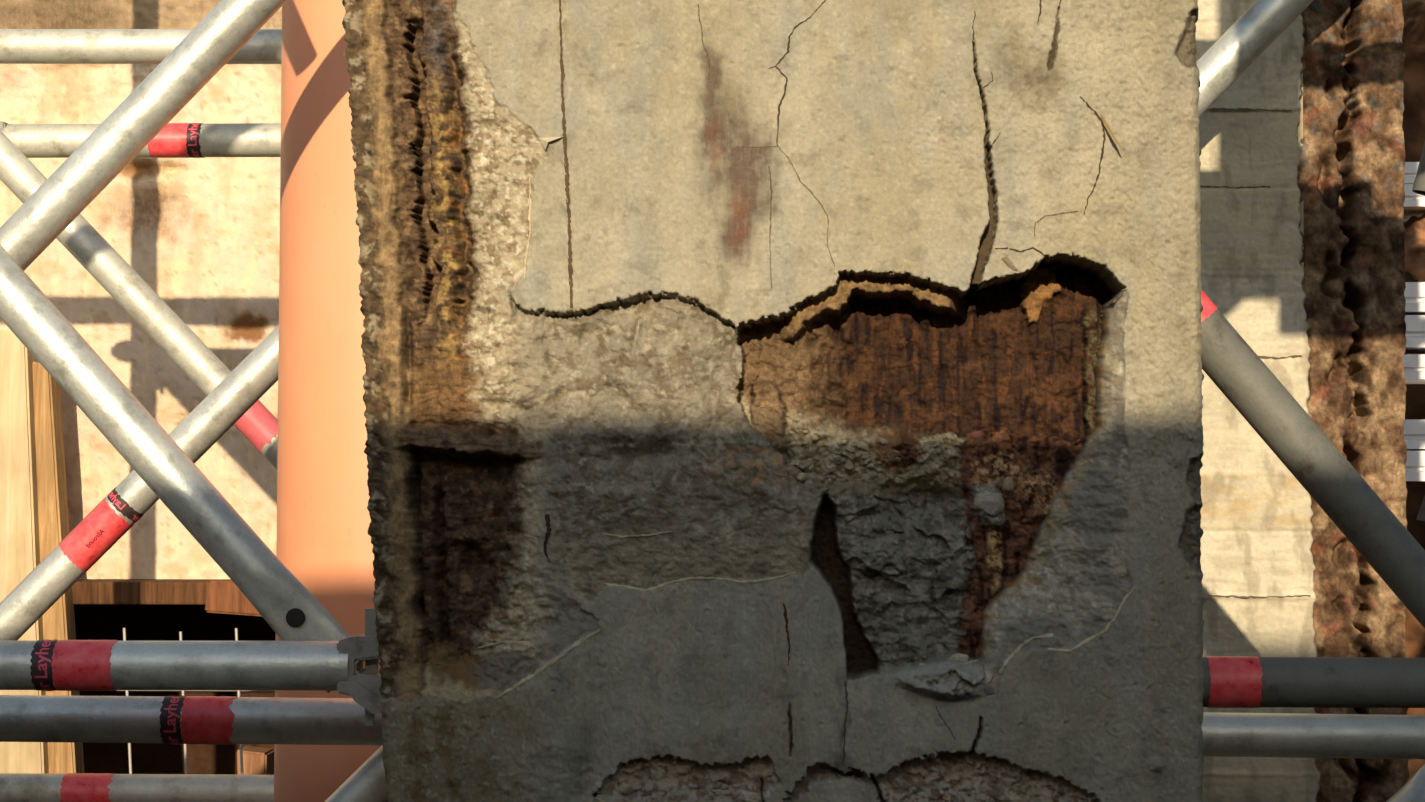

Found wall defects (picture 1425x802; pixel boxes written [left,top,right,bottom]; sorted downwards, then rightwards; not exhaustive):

crack [559,0,573,308]
rust [704,52,768,254]
crack [747,0,835,289]
crack [969,11,1123,289]
crack [1037,0,1061,71]
spalling [343,0,1135,703]
spalling [592,749,1101,802]